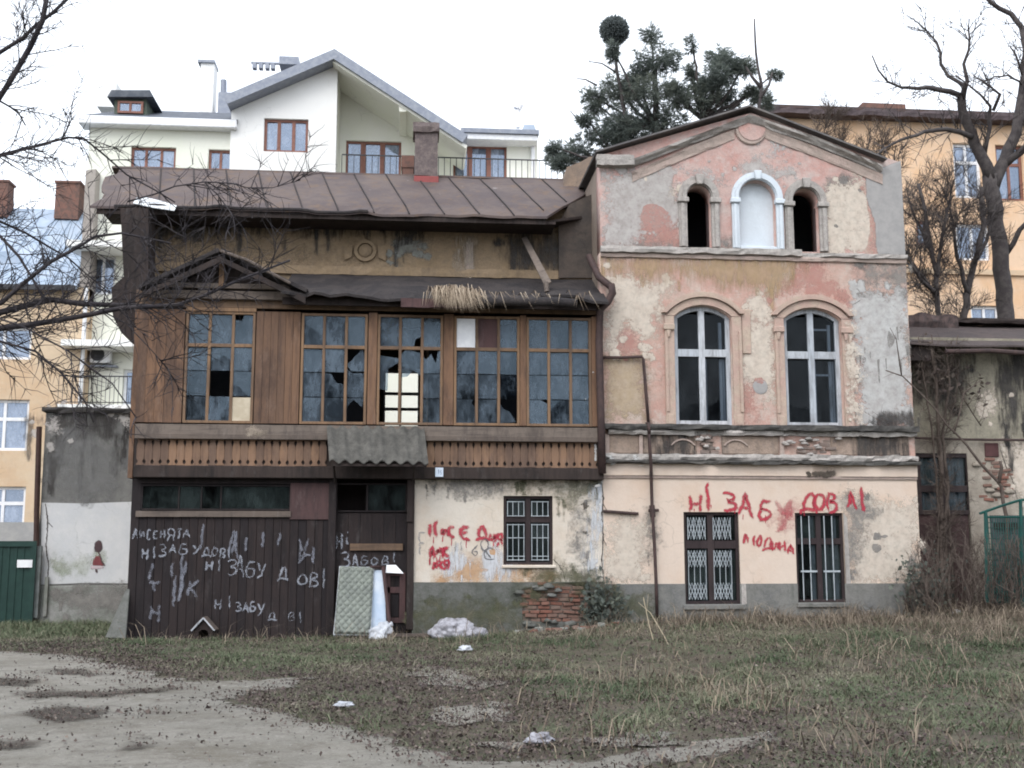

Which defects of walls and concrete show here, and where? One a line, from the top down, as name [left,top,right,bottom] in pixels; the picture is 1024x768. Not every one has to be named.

peeling [600,163,694,362]
peeling [741,173,914,426]
damp [23,403,130,502]
peeling [972,436,1024,508]
damp [991,347,1024,471]
spalling [513,503,653,631]